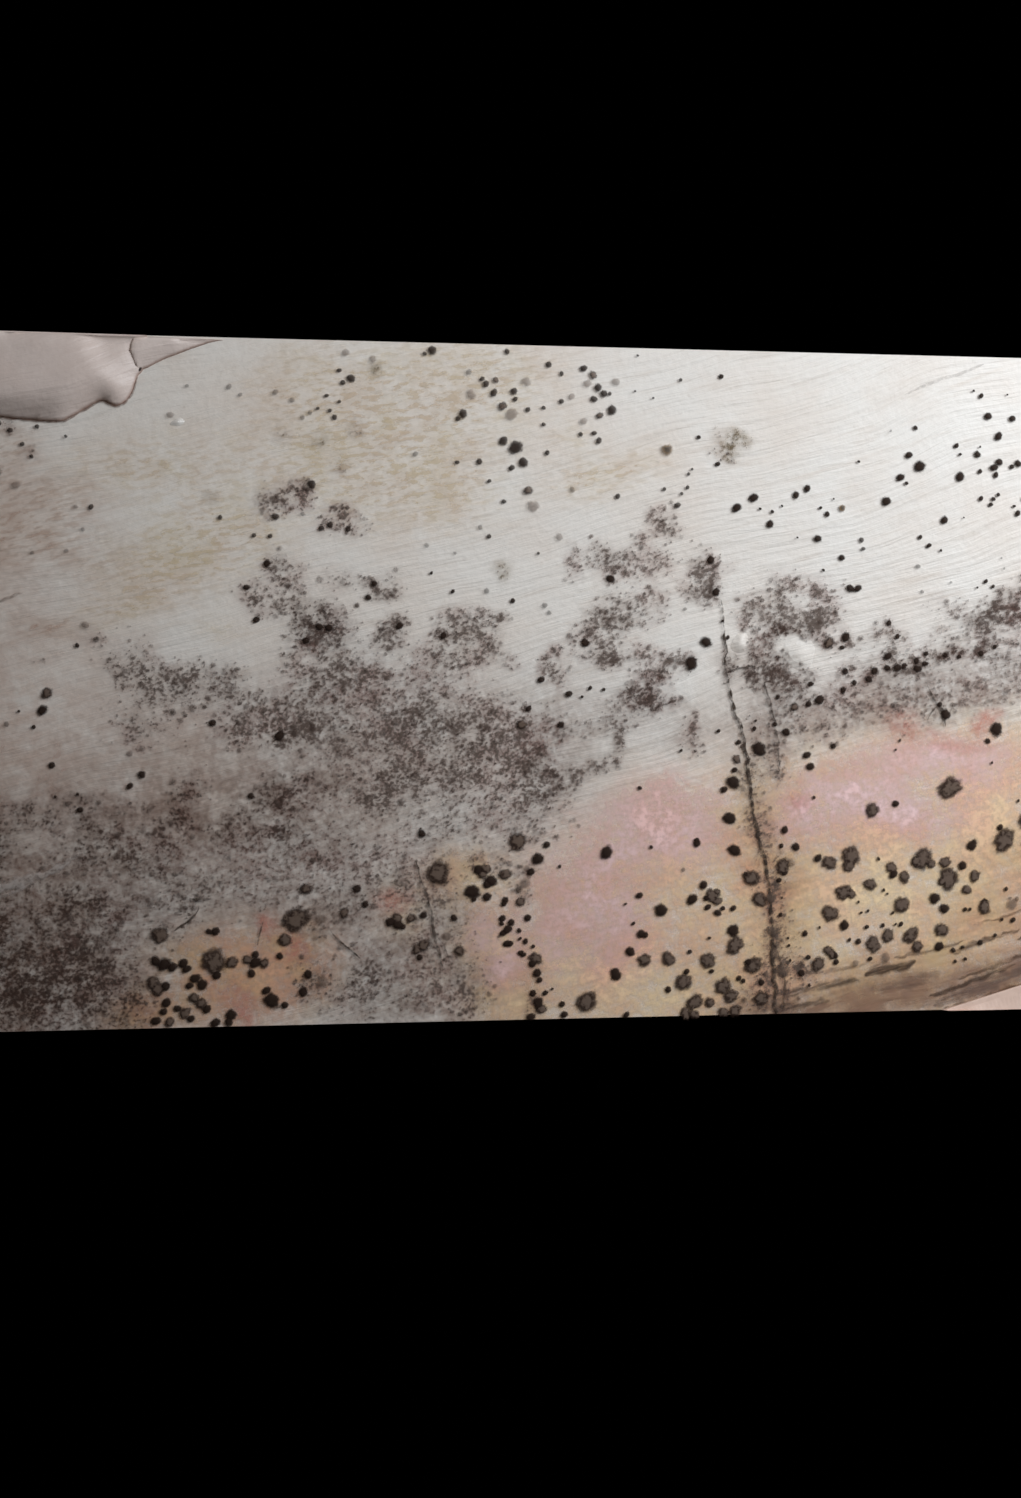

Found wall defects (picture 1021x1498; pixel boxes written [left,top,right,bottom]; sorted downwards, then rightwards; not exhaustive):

water stain [0,364,1021,1031]
crack [721,601,787,1013]